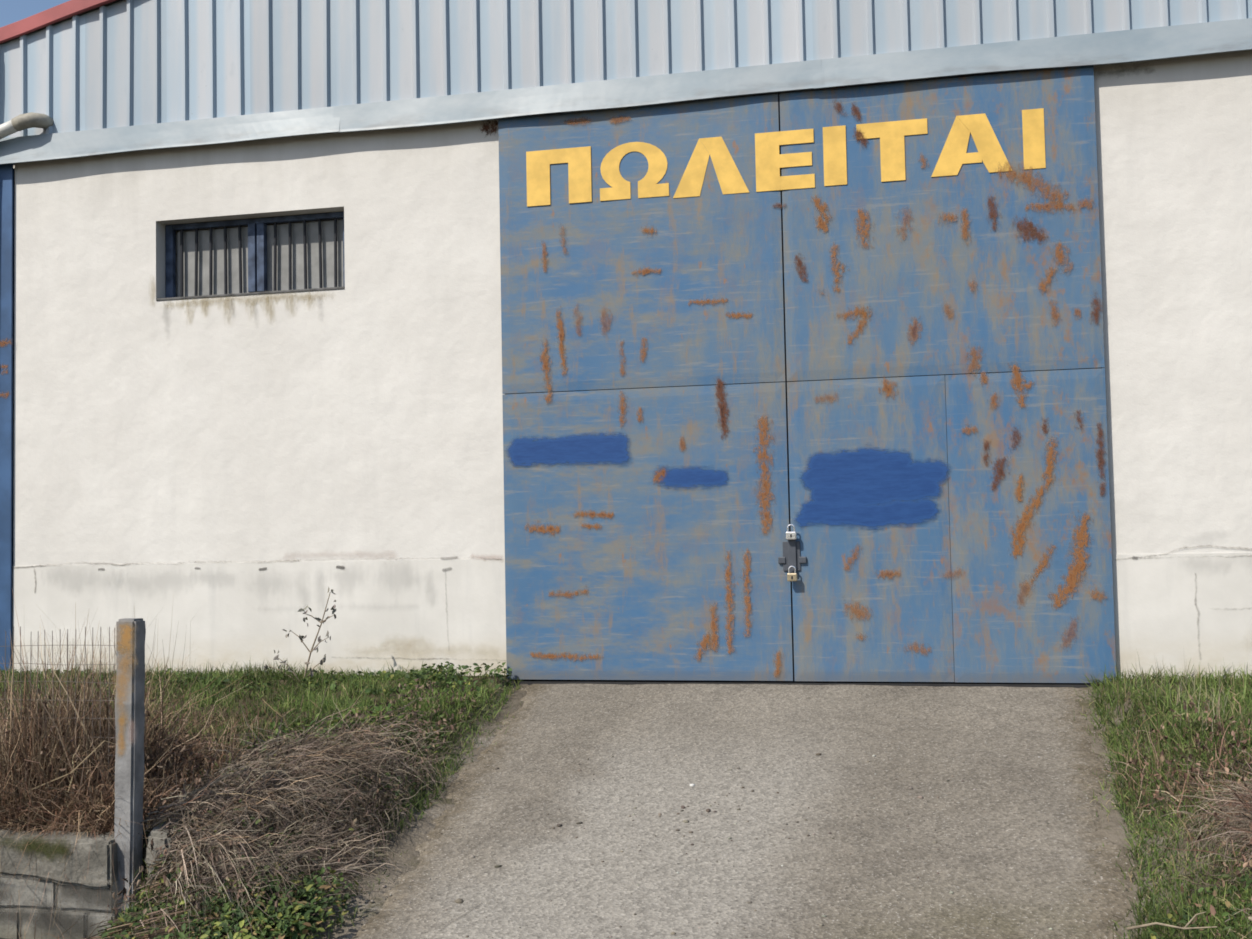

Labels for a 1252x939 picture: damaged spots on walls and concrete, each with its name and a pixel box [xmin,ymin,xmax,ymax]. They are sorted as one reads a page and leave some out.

rust [834,102,868,146]
rust [811,195,844,294]
rust [987,196,997,230]
rust [998,164,1092,242]
rust [1040,242,1072,320]
rust [540,311,567,403]
rust [716,379,729,439]
rust [753,416,774,534]
rust [983,420,1058,559]
rust [1077,410,1106,495]
rust [695,549,752,661]
rust [1051,513,1107,609]